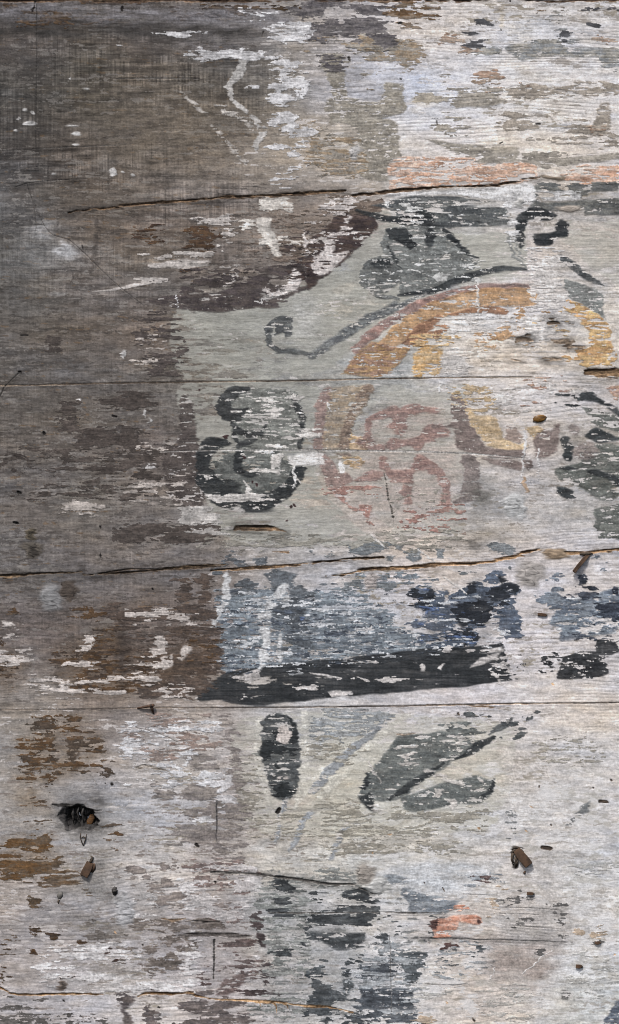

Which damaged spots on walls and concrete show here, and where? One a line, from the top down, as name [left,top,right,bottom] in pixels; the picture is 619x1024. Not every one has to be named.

peeling [0,1,619,706]
rust [0,714,115,909]